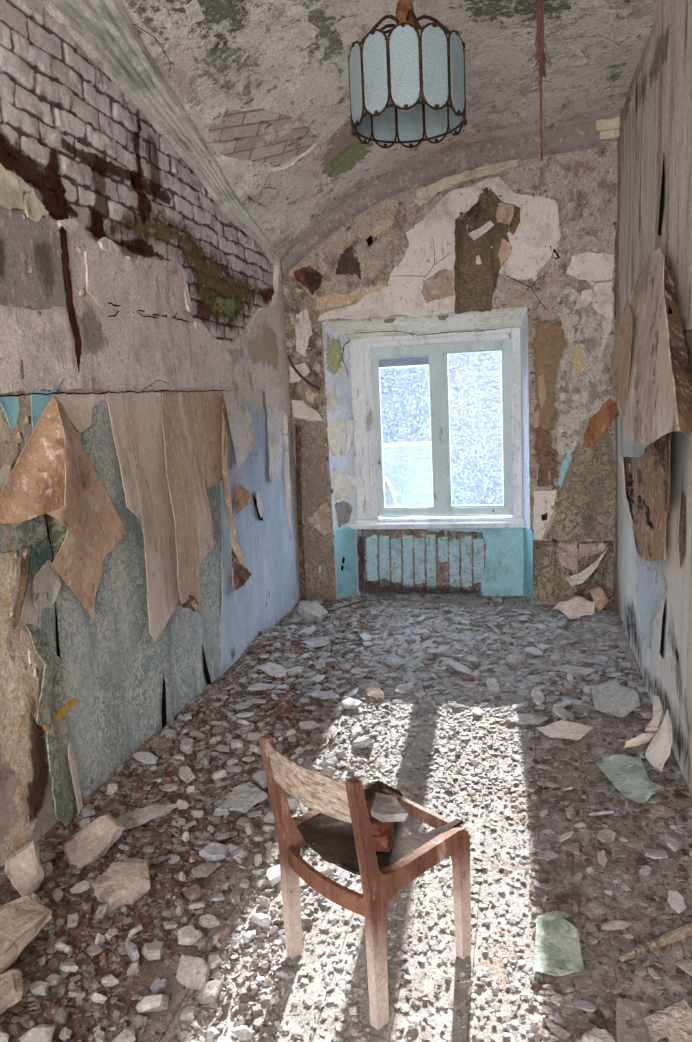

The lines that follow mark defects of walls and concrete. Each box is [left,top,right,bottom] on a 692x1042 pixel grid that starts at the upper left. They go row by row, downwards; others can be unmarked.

damp [89,212,106,240]
corrosion [0,110,171,372]
damp [120,238,159,258]
damp [196,297,237,323]
damp [260,286,274,304]
flaking render [0,0,627,605]
corrosion [357,529,486,596]
peeling [0,537,61,867]
flaking render [299,706,320,730]
flaking render [133,751,158,765]
flaking render [226,757,268,789]
flaking render [191,861,216,878]